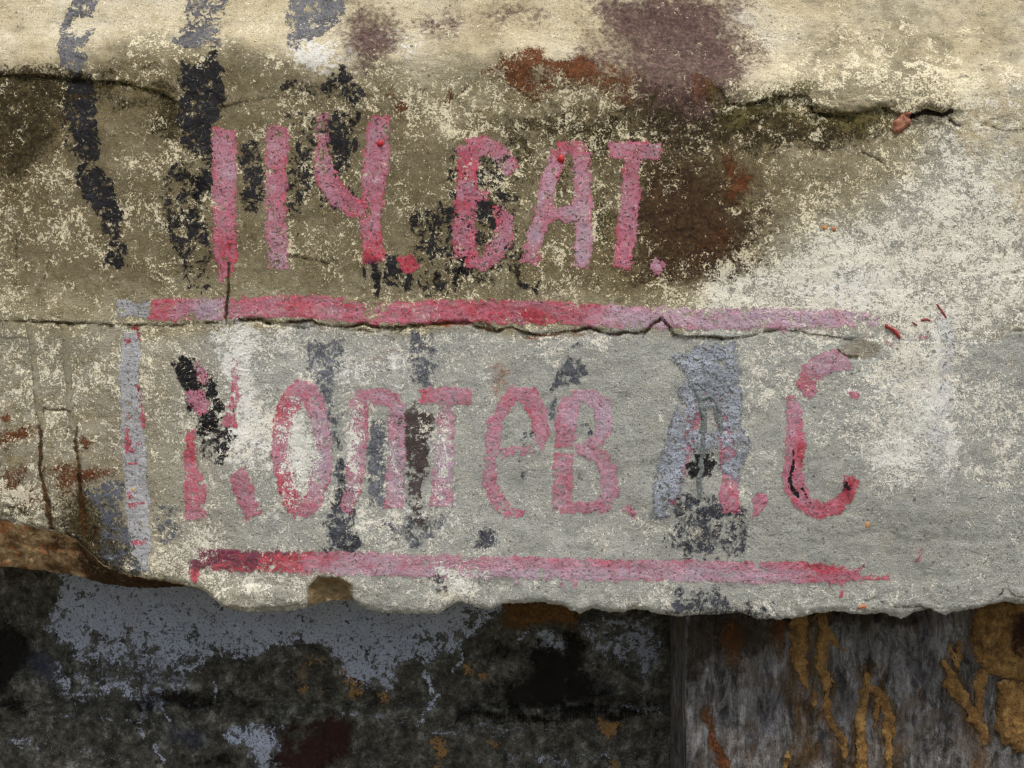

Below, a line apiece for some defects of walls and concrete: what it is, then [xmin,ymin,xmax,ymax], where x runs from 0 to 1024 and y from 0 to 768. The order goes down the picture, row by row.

rust [481,46,648,105]
crack [715,89,961,127]
crack [0,262,737,340]
crack [765,329,862,358]
crack [37,408,96,540]
peeling [0,520,530,768]
peeling [535,753,620,768]
rust [703,707,731,768]